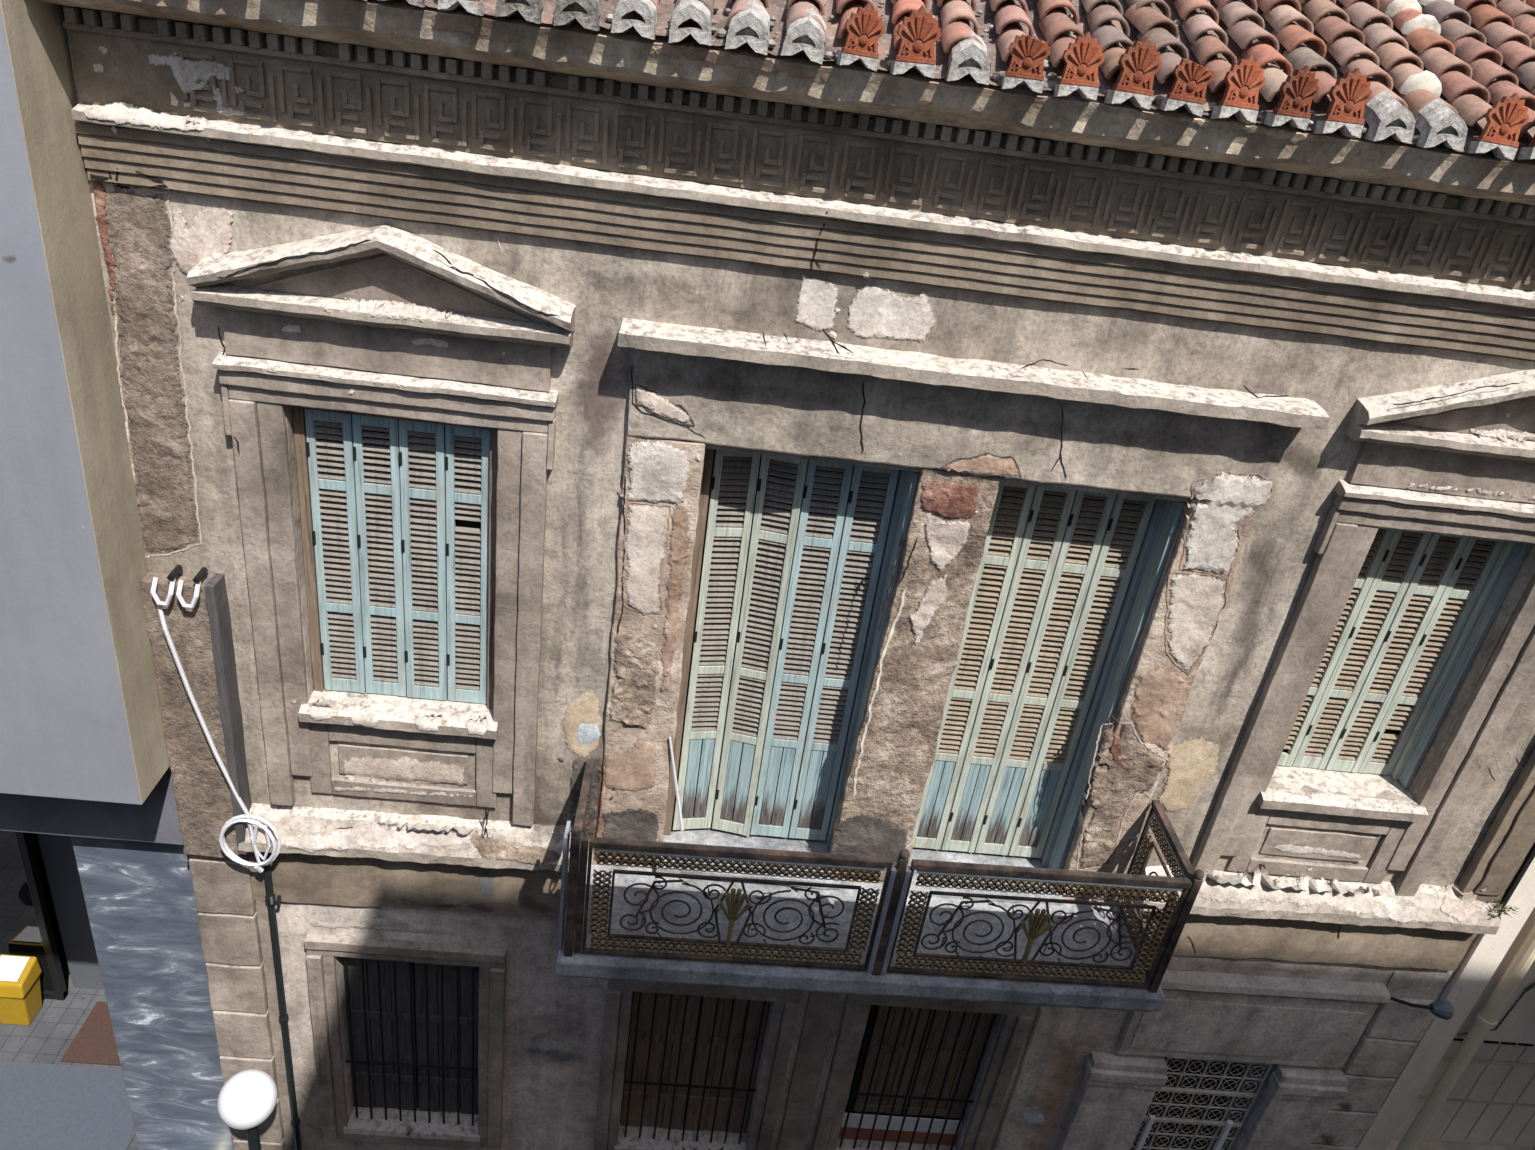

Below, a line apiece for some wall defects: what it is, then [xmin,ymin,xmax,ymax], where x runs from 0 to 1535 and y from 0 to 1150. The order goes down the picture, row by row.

peeling [93,46,116,73]
peeling [85,52,248,142]
crack [432,236,558,316]
crack [811,211,828,270]
peeling [796,272,937,344]
peeling [634,373,695,426]
peeling [607,440,700,729]
flaking render [909,452,1022,645]
flaking render [1076,471,1275,870]